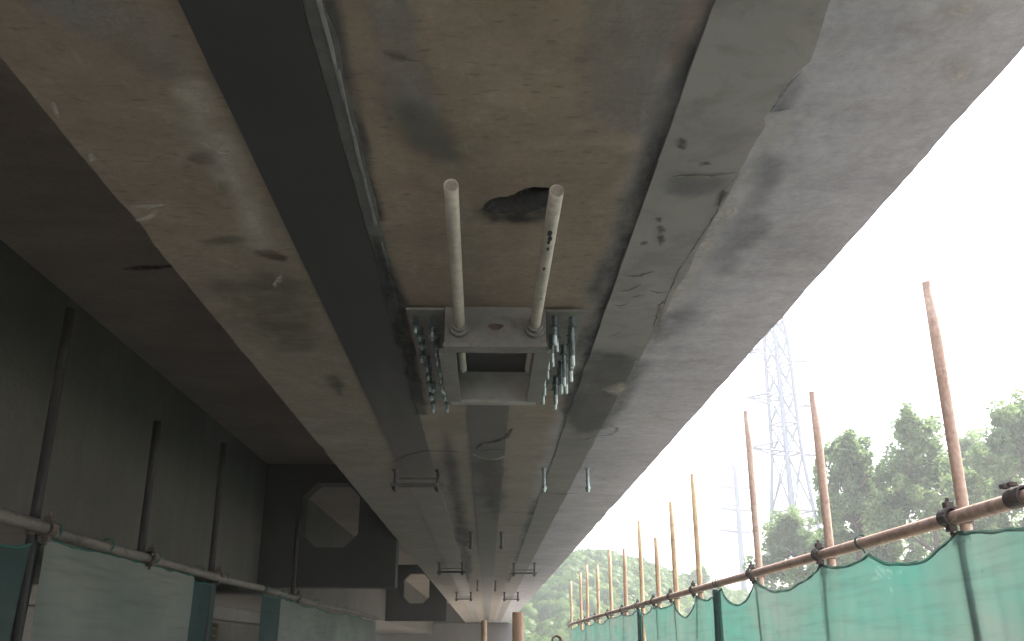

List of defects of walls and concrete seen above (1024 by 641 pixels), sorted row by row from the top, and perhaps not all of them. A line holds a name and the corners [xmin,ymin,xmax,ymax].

leakage [674,46,695,90]
spalling [481,187,550,223]
leakage [630,129,666,212]
leakage [566,233,635,432]